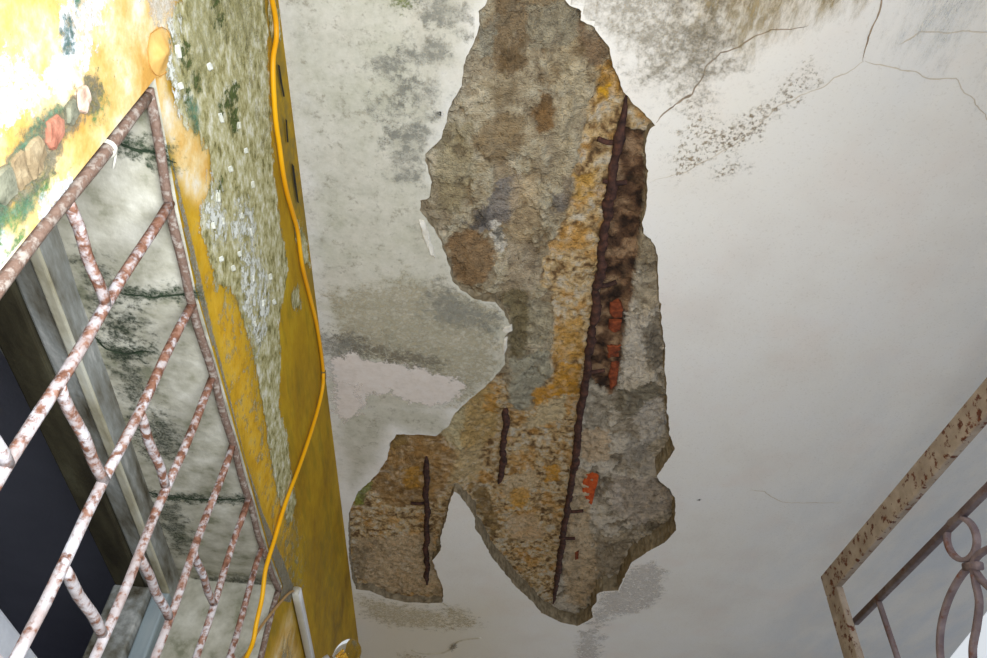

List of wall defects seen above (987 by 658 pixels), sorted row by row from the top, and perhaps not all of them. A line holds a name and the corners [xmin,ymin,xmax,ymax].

mould [371,39,452,182]
mould [421,0,474,39]
mould [675,100,777,175]
crack [653,0,987,181]
spalling [327,0,676,626]